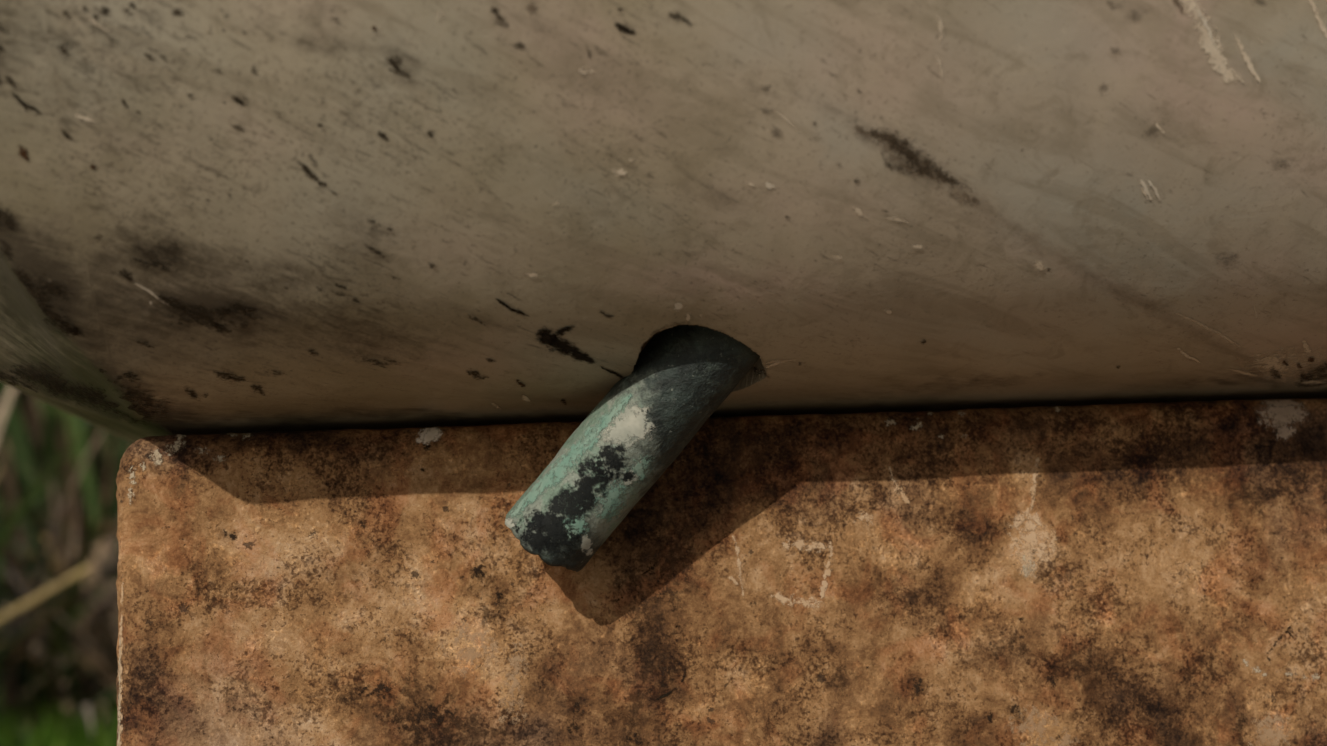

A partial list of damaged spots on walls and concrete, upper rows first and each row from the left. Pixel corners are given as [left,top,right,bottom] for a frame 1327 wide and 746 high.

water stain [856,126,977,202]
water stain [0,207,82,337]
water stain [120,237,263,333]
water stain [0,363,170,424]
water stain [597,406,655,448]
water stain [1256,399,1310,440]
water stain [581,534,593,556]
water stain [729,536,744,596]
water stain [771,539,833,608]
water stain [1009,458,1056,578]
water stain [361,679,399,699]
water stain [409,703,454,725]